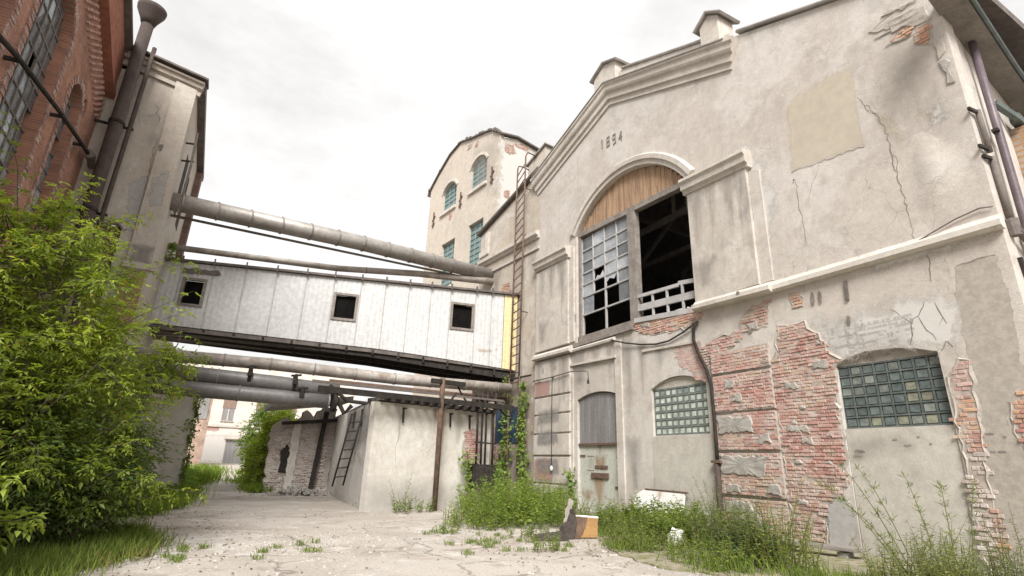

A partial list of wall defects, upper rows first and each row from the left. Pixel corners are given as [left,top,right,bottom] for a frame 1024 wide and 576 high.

flaking render [868,0,955,85]
flaking render [126,171,169,232]
crack [860,100,953,351]
flaking render [462,427,481,467]
flaking render [633,291,865,550]
flaking render [946,255,1024,576]